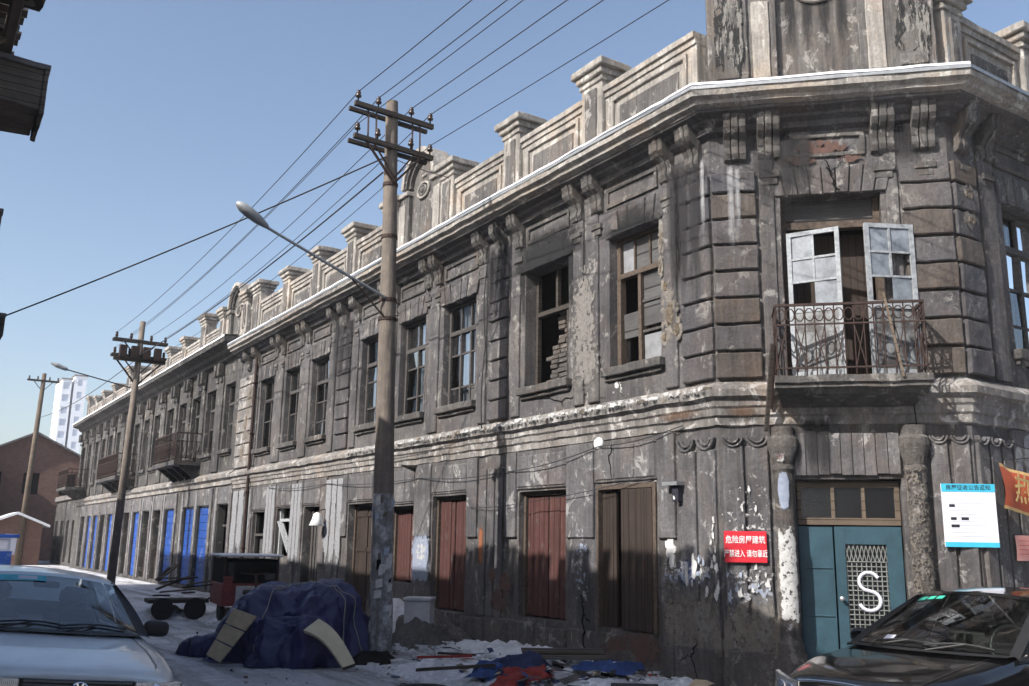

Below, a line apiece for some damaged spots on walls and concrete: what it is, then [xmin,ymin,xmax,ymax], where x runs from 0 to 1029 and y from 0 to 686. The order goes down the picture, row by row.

crack [824,159,843,190]
peeling [374,548,393,617]
flaking render [663,451,801,657]
crack [580,594,590,648]